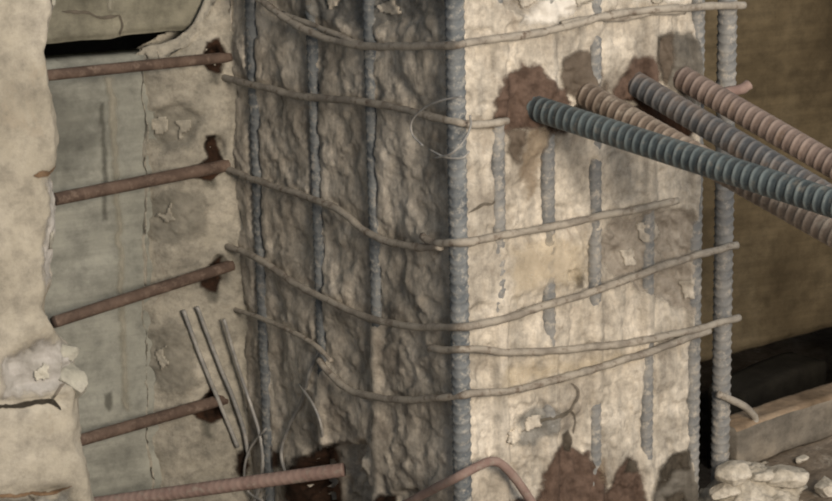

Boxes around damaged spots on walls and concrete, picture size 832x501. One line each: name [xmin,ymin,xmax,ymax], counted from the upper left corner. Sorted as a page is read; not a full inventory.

peeling [498,0,602,25]
corrosion [47,52,233,81]
corrosion [613,56,693,137]
corrosion [54,160,231,206]
spalling [303,0,422,377]
spalling [444,0,473,501]
spalling [540,132,556,346]
corrosion [50,260,235,328]
crack [0,383,65,410]
spalling [686,338,701,497]
corrosion [93,444,346,501]
corrosion [536,430,647,501]